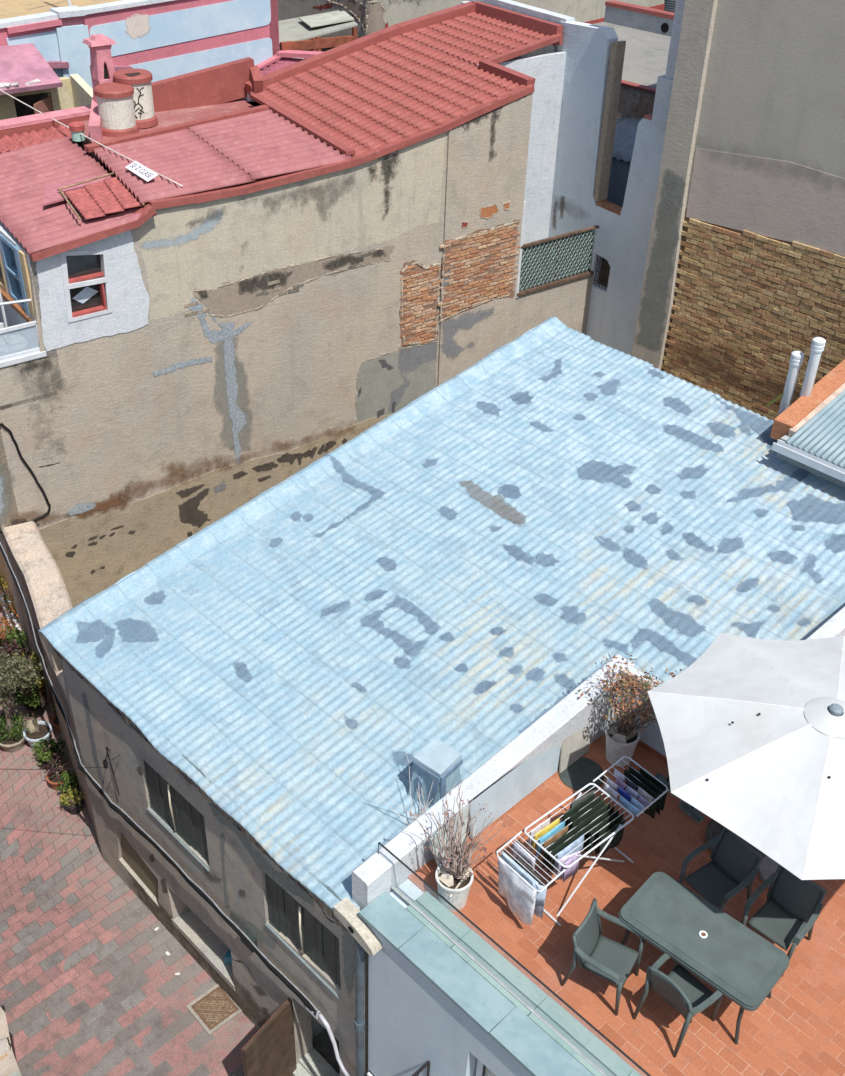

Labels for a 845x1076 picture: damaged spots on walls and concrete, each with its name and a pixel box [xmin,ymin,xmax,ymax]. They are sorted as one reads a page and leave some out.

peeling [184,246,394,317]
flaking render [399,201,520,347]
peeling [0,1037,10,1054]